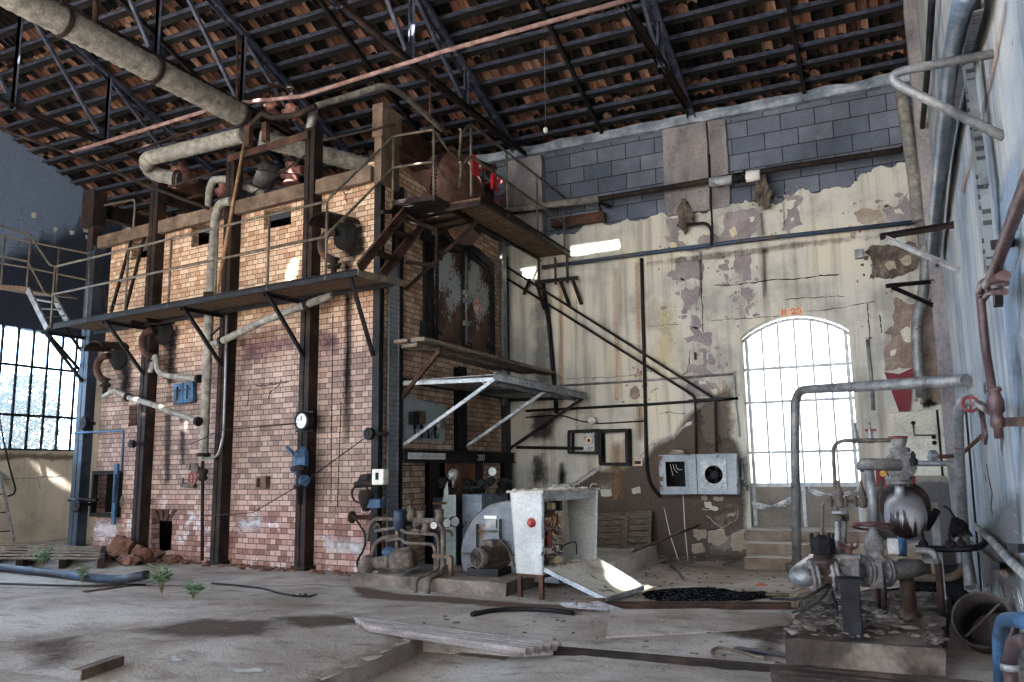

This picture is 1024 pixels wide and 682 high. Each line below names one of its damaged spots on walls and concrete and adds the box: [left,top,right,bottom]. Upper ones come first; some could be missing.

peeling [658,185,813,399]
peeling [842,189,941,411]
water stain [532,411,553,440]
water stain [533,455,544,482]
spalling [692,495,746,554]